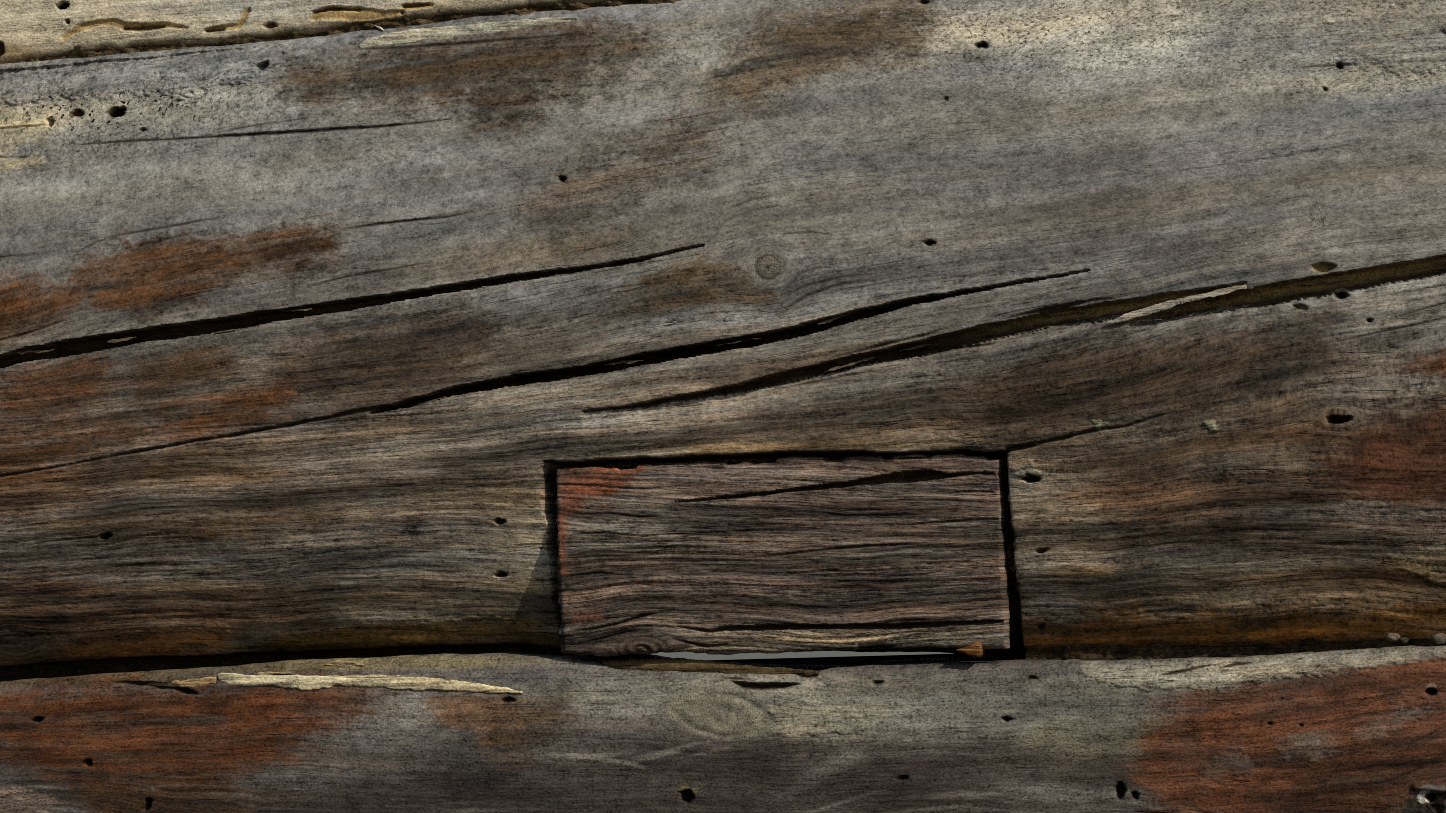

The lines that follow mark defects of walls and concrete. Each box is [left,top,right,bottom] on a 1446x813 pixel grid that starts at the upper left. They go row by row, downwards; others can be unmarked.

rust [0,204,358,490]
crack [0,193,1446,477]
rust [1112,647,1446,813]